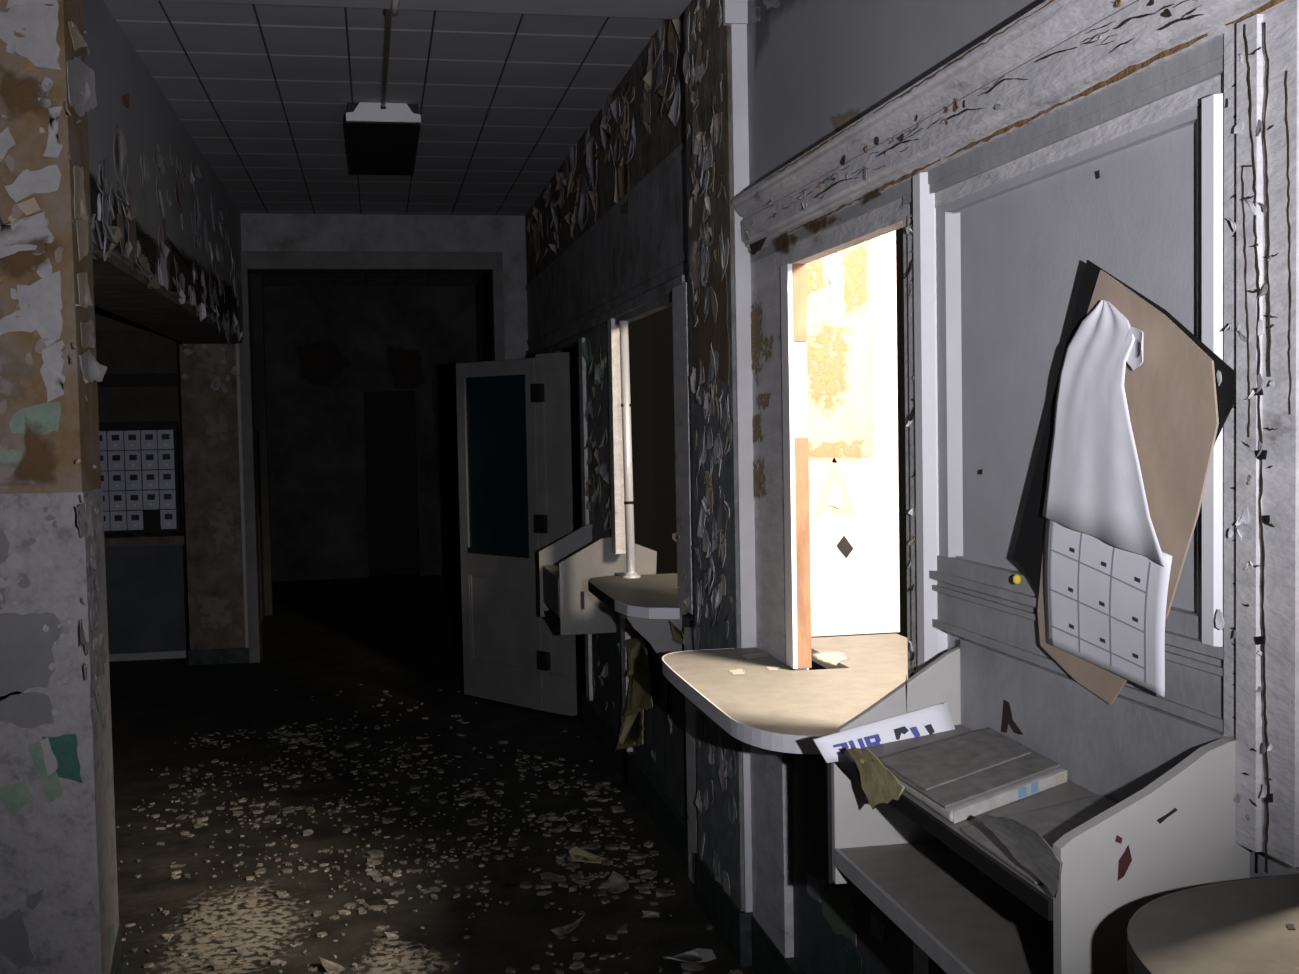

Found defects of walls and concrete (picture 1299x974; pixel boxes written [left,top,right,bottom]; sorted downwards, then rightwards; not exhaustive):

peeling [0,0,243,467]
peeling [527,0,733,650]
peeling [753,458,765,498]
peeling [751,303,773,443]
peeling [806,238,875,519]
peeling [798,115,920,211]
peeling [906,359,915,427]
crack [766,0,1204,218]
peeling [1228,507,1249,541]
peeling [1224,319,1265,342]
crack [1230,22,1292,873]
flaking render [0,484,108,814]